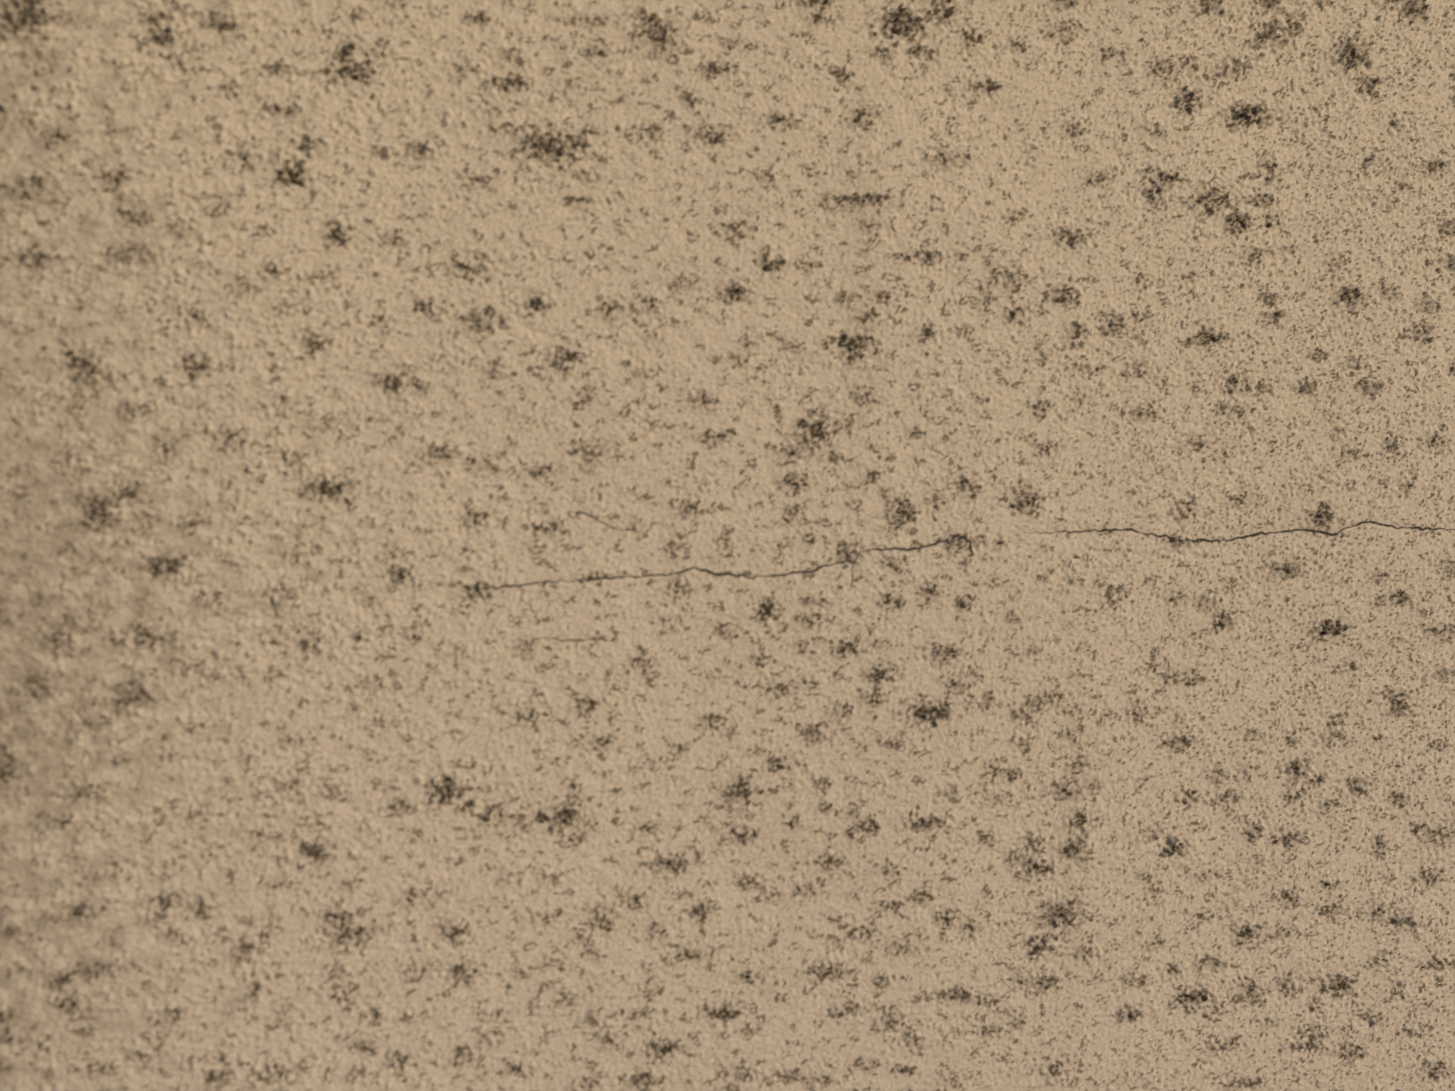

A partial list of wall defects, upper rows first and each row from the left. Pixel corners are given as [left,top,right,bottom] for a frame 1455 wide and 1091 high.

crack [572,511,636,531]
crack [1016,521,1455,543]
crack [481,534,974,590]